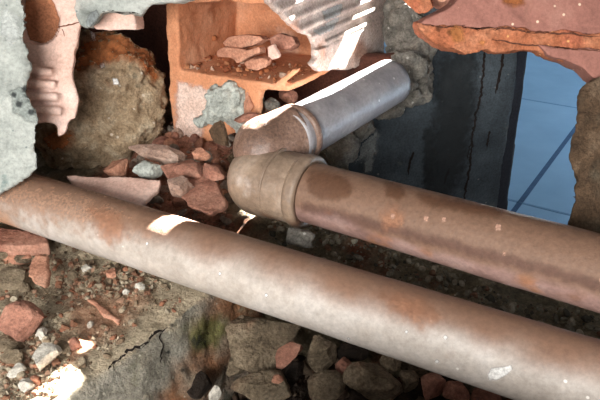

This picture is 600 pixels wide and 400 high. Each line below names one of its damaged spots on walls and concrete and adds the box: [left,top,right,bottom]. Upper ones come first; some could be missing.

spalling [412,0,600,83]
spalling [10,86,38,123]
crack [425,24,599,199]
crack [108,327,168,369]